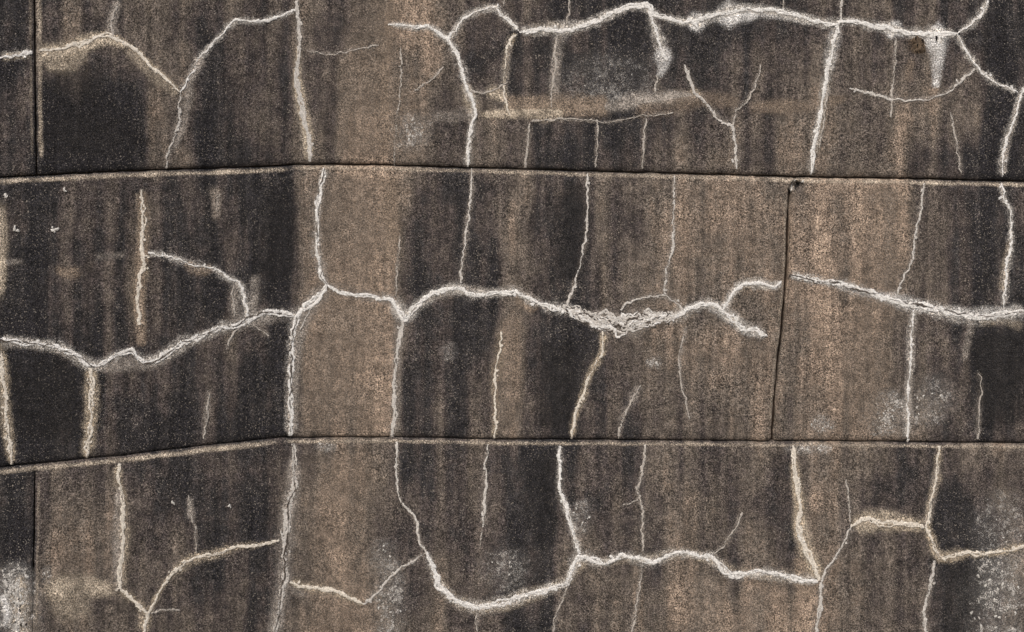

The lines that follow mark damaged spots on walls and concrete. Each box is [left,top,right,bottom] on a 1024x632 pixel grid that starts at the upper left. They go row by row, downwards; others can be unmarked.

water stain [349,62,423,146]
water stain [482,74,702,119]
crack [0,0,1024,465]
water stain [559,238,579,278]
crack [480,332,503,544]
water stain [872,392,903,435]
crack [114,444,419,632]
crack [394,442,1024,632]
water stain [43,571,112,600]
water stain [375,545,403,632]
water stain [969,555,1022,632]